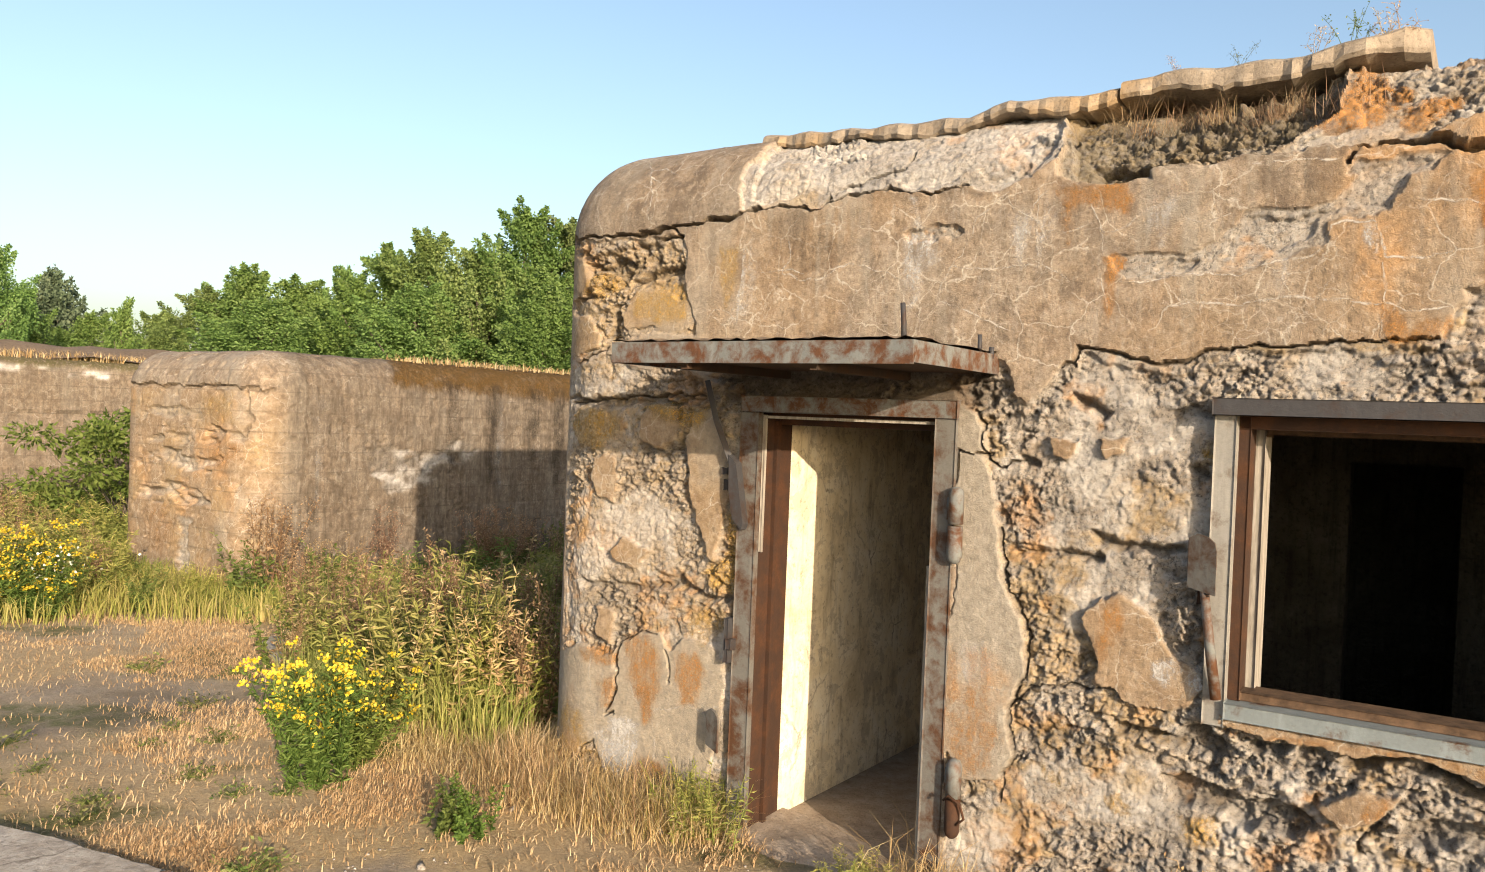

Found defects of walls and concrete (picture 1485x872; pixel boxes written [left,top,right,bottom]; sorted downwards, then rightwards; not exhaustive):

crack [763,152,1461,368]
spalling [740,58,1485,280]
spalling [556,233,1485,872]
crack [970,526,1135,803]